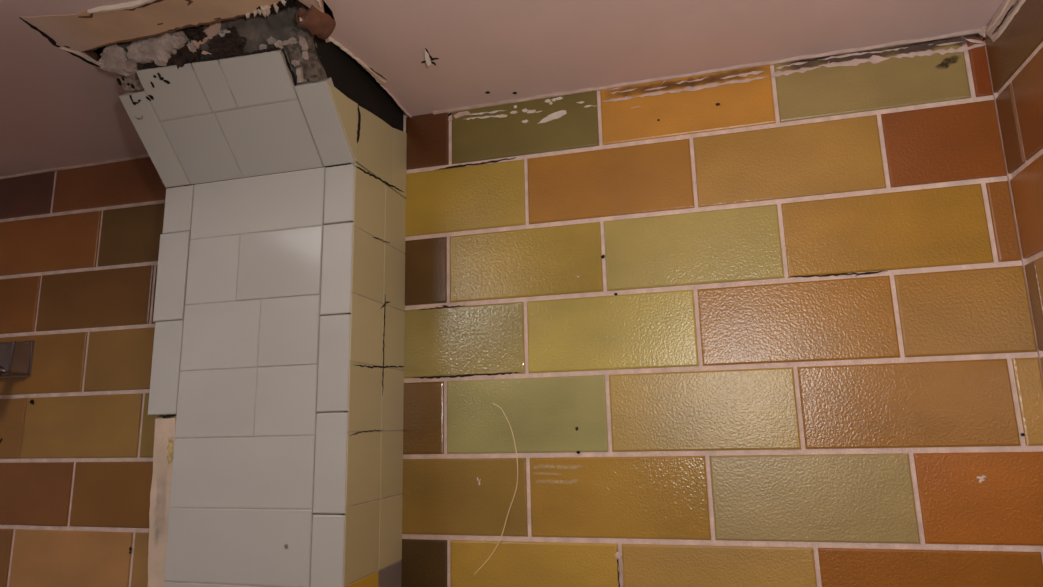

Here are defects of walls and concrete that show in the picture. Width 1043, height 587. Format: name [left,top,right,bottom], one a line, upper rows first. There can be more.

peeling [87,0,155,13]
crack [859,0,1019,53]
spalling [96,21,412,118]